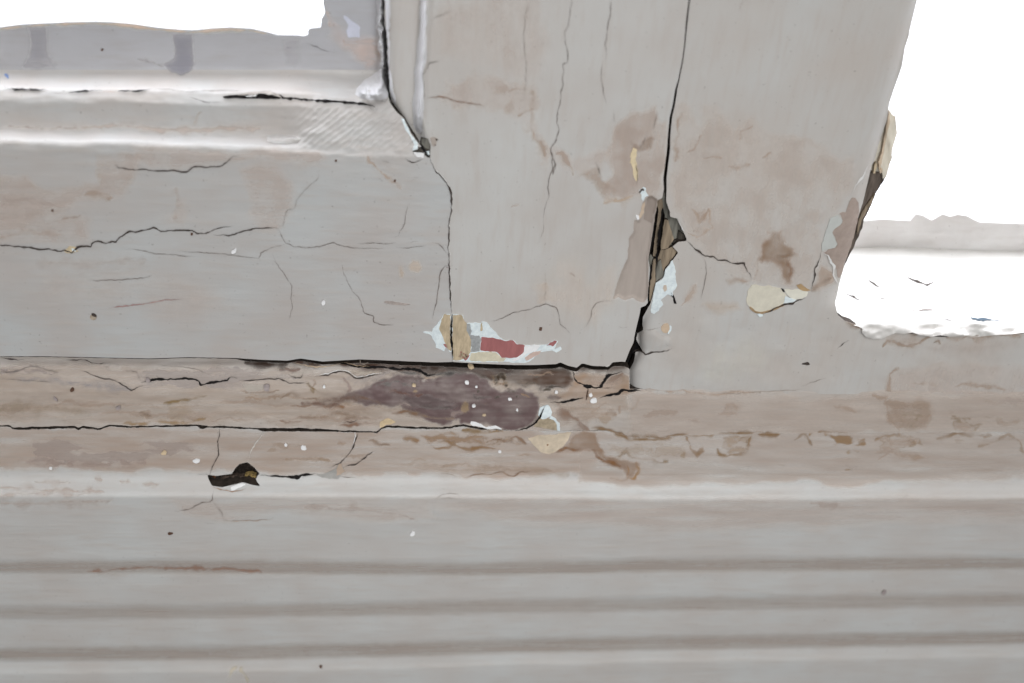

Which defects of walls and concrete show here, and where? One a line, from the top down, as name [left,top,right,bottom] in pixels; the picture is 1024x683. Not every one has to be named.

crack [422,61,480,113]
crack [116,156,235,173]
peeling [746,109,897,317]
crack [0,159,453,325]
peeling [613,148,677,362]
peeling [423,314,561,363]
crack [5,358,434,391]
crack [550,372,651,403]
leakage [0,361,1024,502]